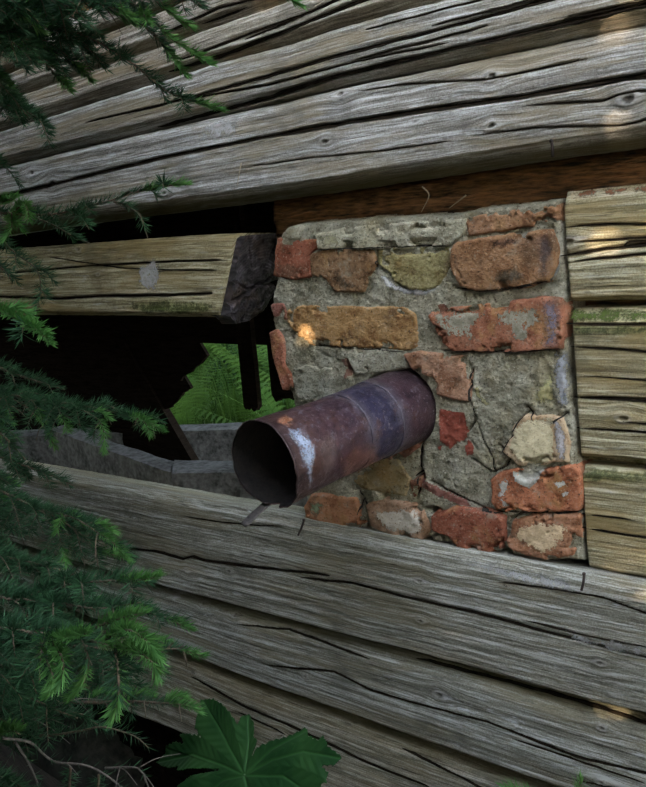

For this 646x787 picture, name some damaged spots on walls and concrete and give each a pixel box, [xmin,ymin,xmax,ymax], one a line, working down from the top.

crack [0,0,646,198]
peeling [435,304,485,340]
peeling [497,304,541,341]
crack [566,320,646,328]
peeling [498,418,554,507]
crack [447,346,646,472]
crack [126,547,646,659]
crack [267,658,646,787]